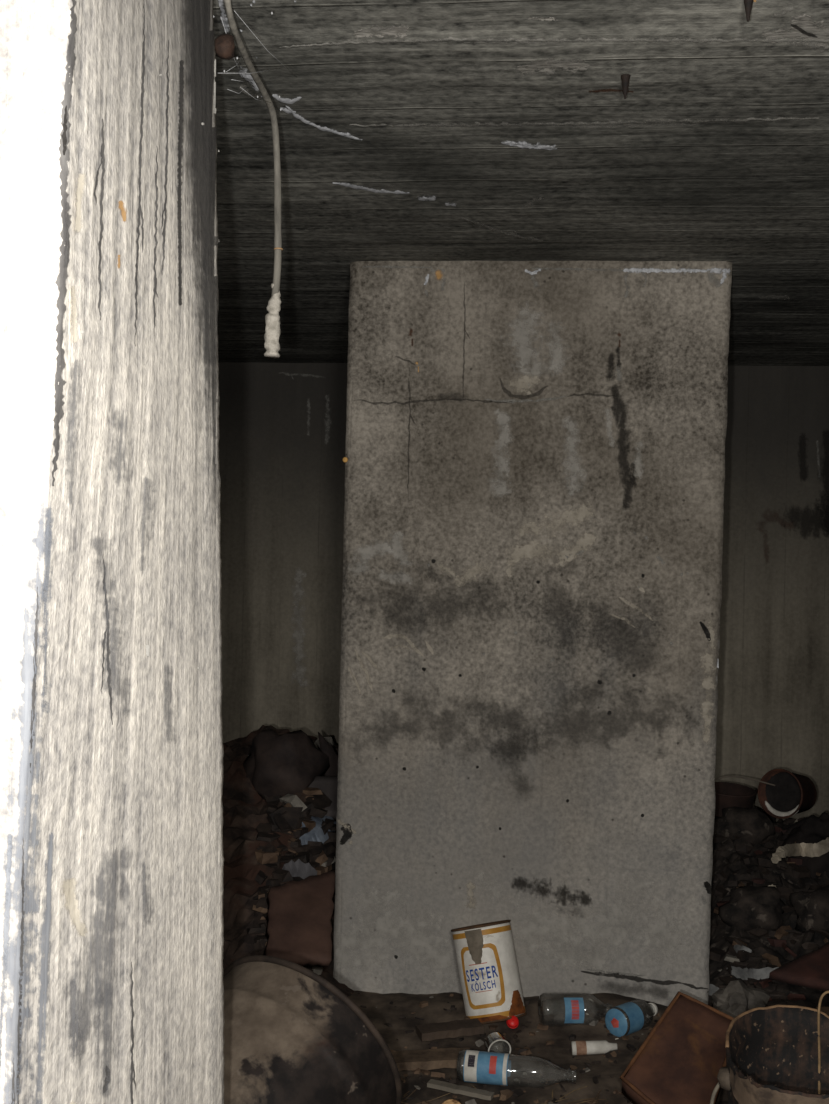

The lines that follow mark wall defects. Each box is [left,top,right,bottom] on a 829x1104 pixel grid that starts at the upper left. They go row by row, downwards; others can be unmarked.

water stain [606,348,642,508]
water stain [788,431,829,537]
water stain [512,878,691,972]